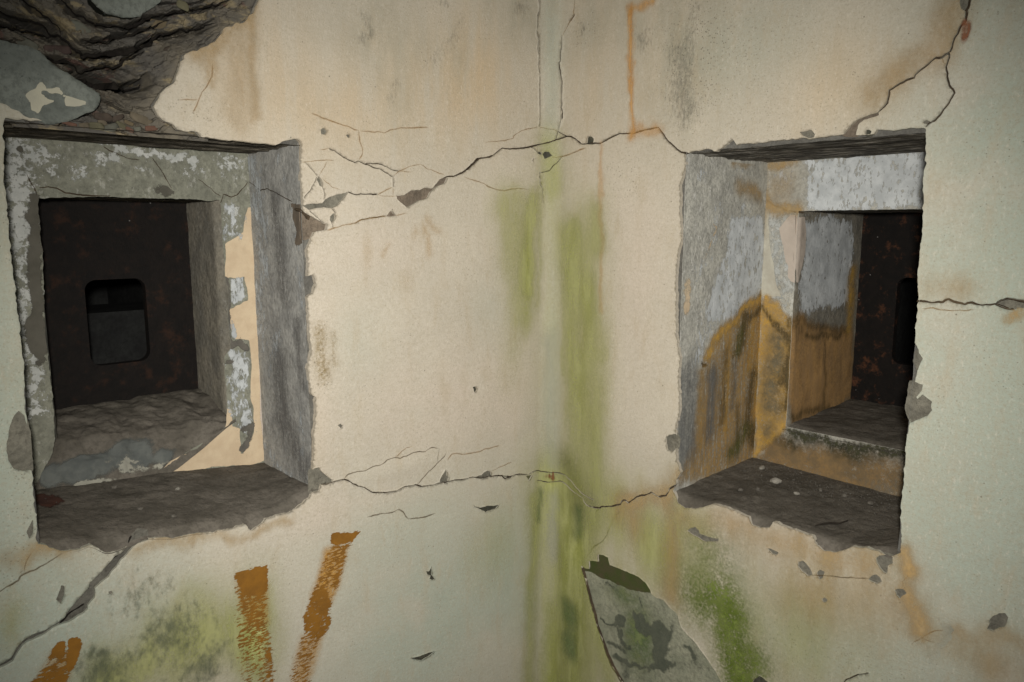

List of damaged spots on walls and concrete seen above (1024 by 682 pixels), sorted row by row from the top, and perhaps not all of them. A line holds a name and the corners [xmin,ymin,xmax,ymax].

rust [628,0,654,136]
crack [879,0,971,127]
crack [104,147,171,187]
crack [198,110,689,230]
spalling [0,0,256,471]
peeling [74,153,331,494]
spalling [905,350,932,422]
crack [917,298,1024,311]
crack [321,446,677,555]
crack [0,528,149,666]
peeling [582,555,721,682]